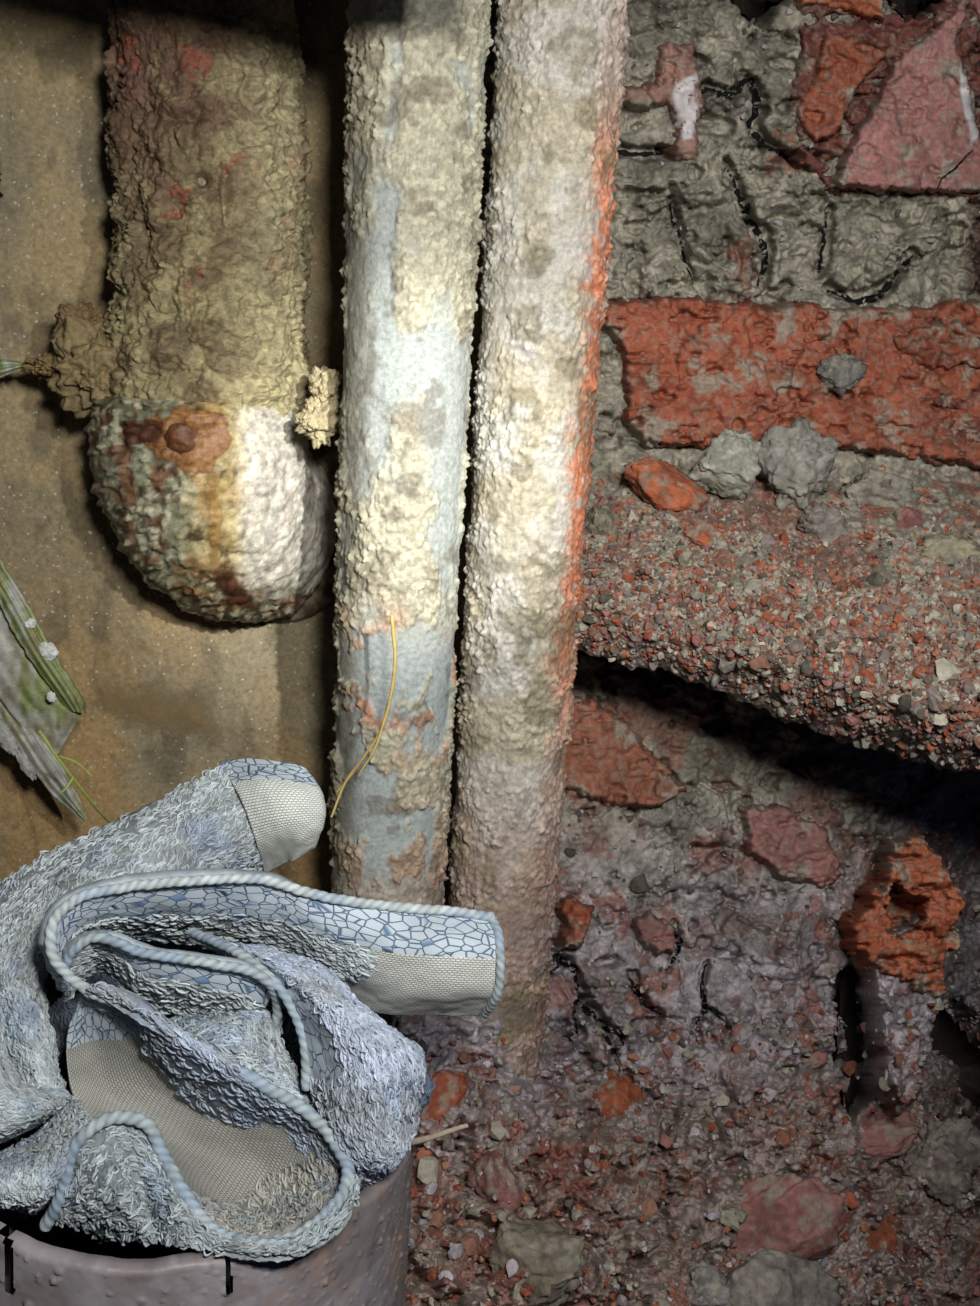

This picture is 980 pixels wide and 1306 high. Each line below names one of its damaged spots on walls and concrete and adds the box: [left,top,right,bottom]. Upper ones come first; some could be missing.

crack [618,149,661,157]
crack [701,78,790,162]
spalling [782,0,980,204]
crack [934,150,973,192]
crack [669,199,692,277]
crack [727,169,769,286]
crack [817,212,913,305]
rust [120,405,260,611]
spalling [737,803,842,889]
spalling [836,828,966,1008]